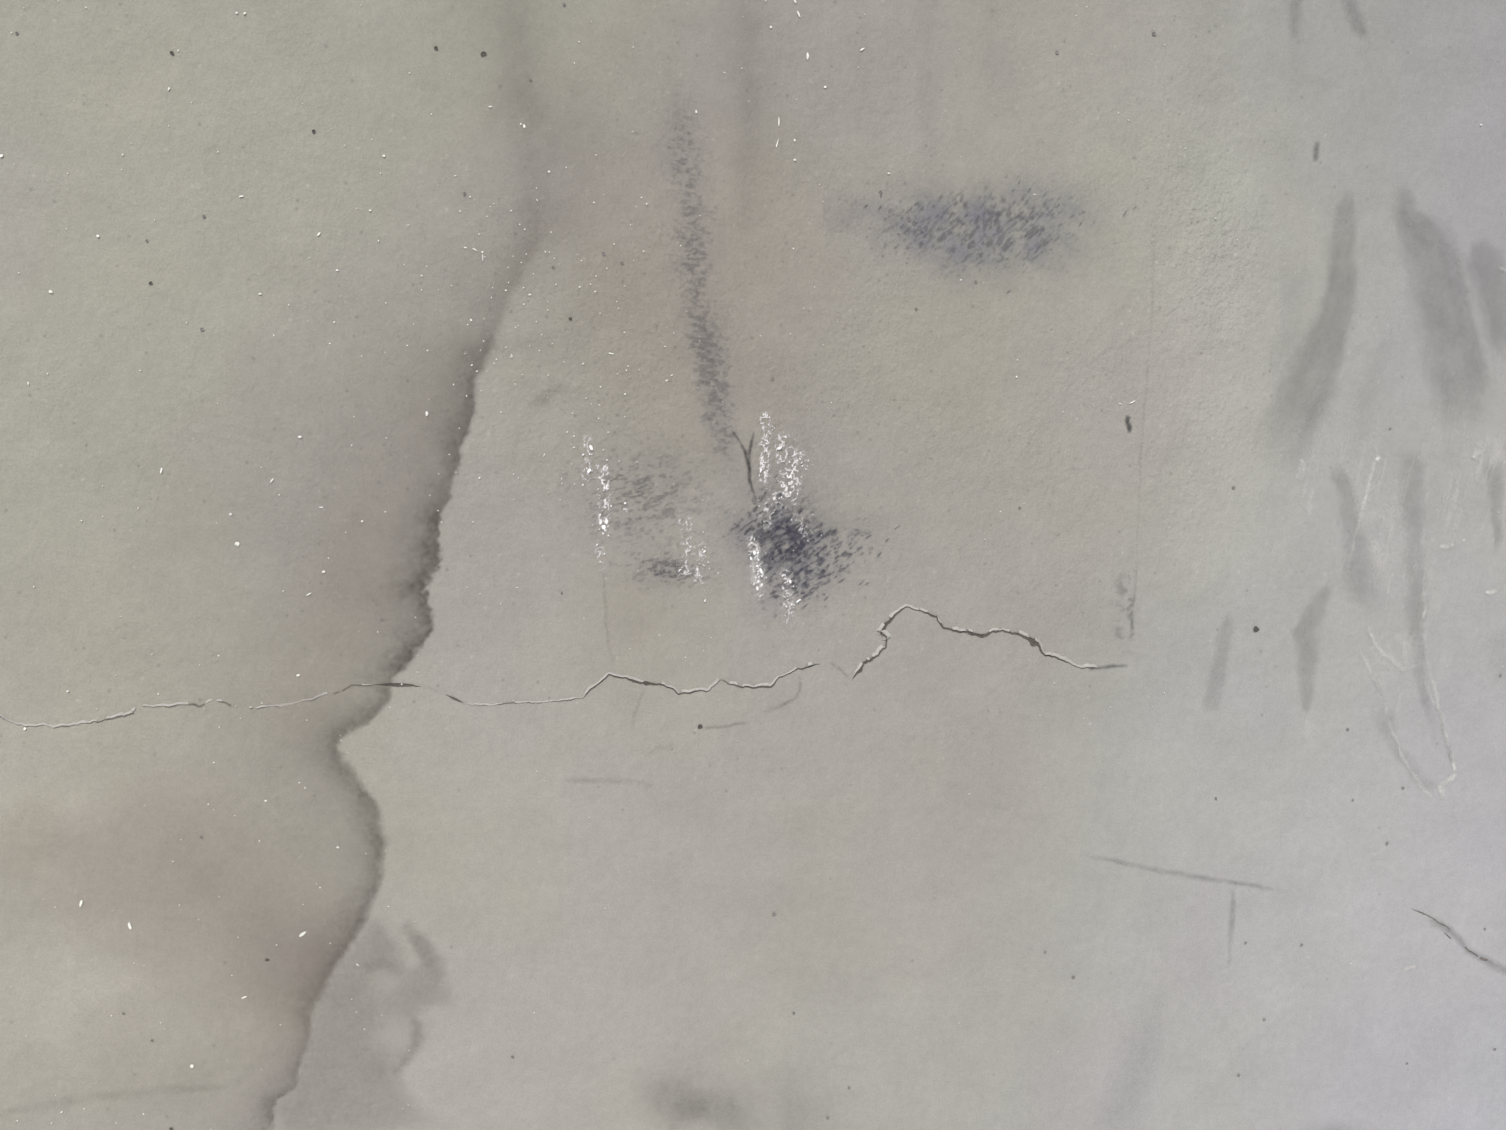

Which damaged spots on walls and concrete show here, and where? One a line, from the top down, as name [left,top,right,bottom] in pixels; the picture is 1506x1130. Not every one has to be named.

water stain [397,512,439,671]
crack [851,604,1100,680]
crack [0,662,817,728]
crack [1413,909,1488,961]